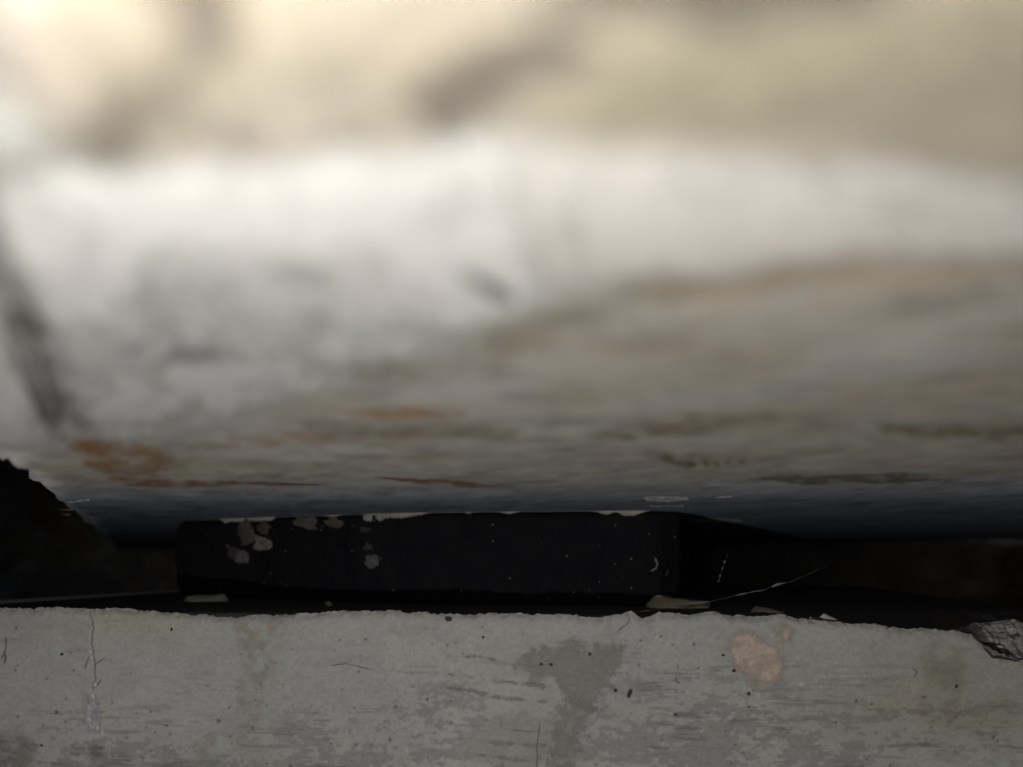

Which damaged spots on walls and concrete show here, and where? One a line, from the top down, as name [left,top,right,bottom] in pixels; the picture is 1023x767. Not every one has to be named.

crack [83,615,105,734]
damp [508,639,625,767]
spalling [948,619,1023,662]